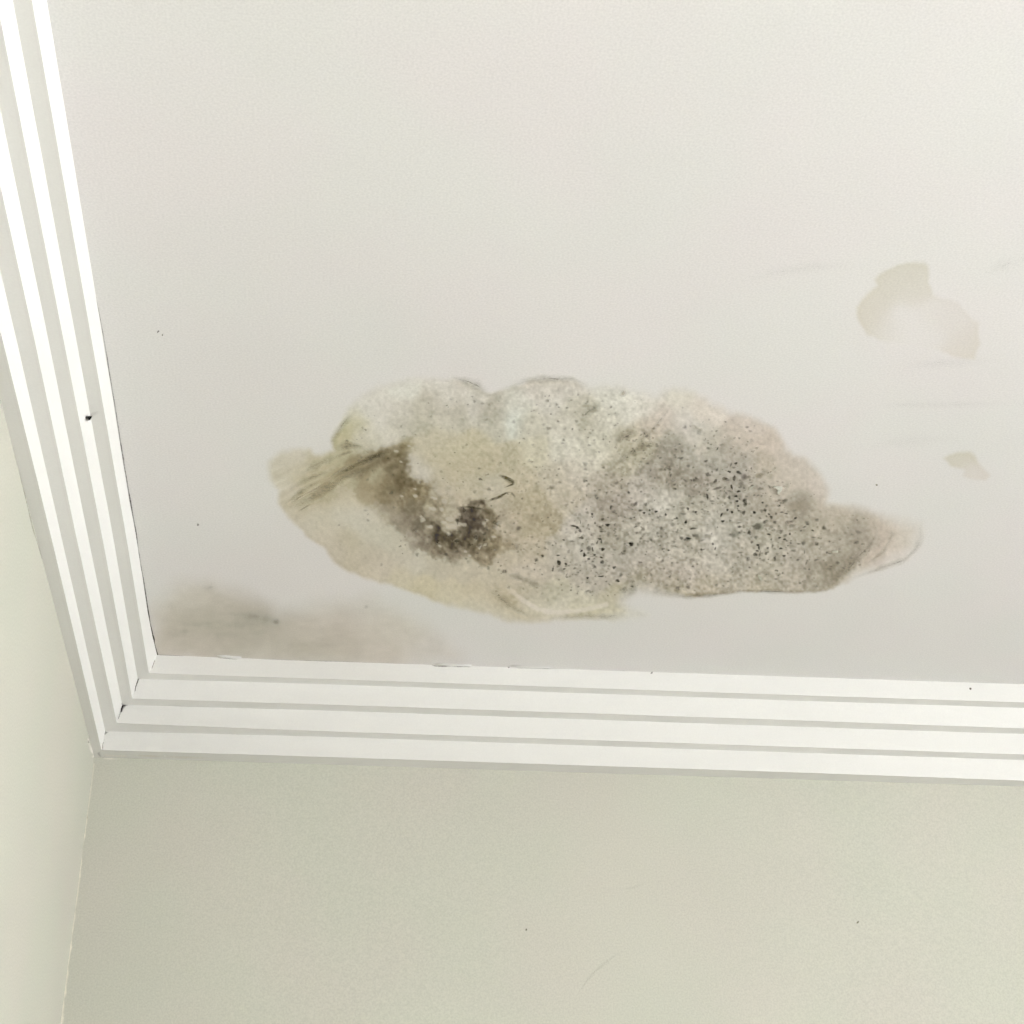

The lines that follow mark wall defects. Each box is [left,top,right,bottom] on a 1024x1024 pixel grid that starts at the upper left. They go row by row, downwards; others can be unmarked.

damp [853,258,984,363]
damp [939,448,994,483]
damp [145,372,930,666]